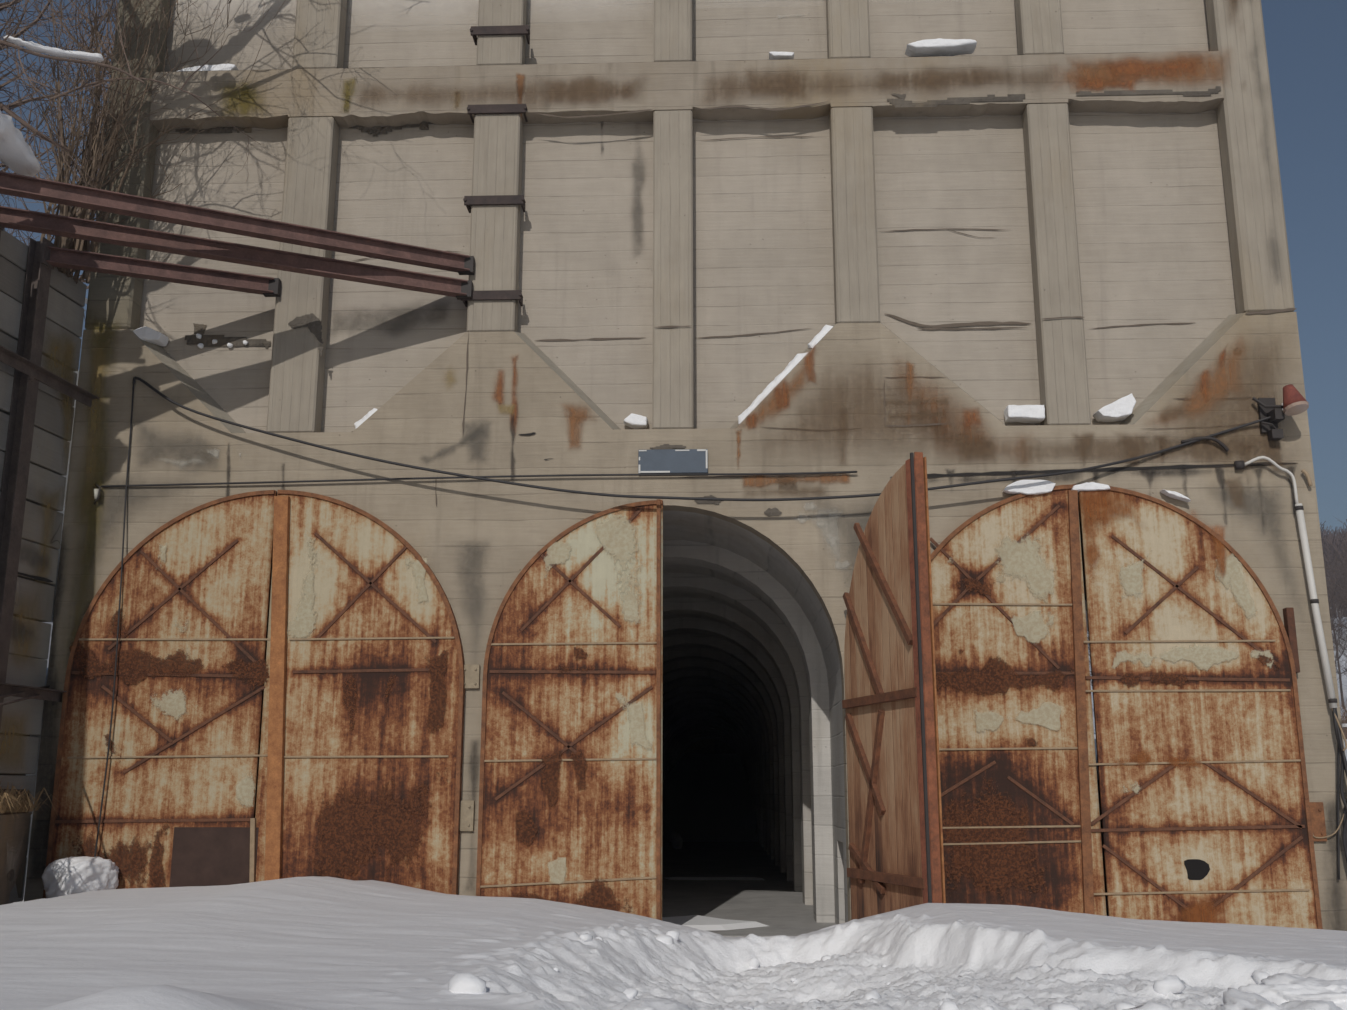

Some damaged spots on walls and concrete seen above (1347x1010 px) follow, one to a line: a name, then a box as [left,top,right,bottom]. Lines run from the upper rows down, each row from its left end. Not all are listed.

corrosion [1067,57,1221,89]
corrosion [737,350,814,458]
corrosion [69,608,204,685]
corrosion [426,650,449,734]
corrosion [936,656,1072,698]
corrosion [1120,671,1187,687]
corrosion [540,749,587,807]
corrosion [72,822,170,888]
corrosion [308,768,448,881]
corrosion [942,780,1047,900]
corrosion [508,878,644,913]
corrosion [1182,903,1215,923]